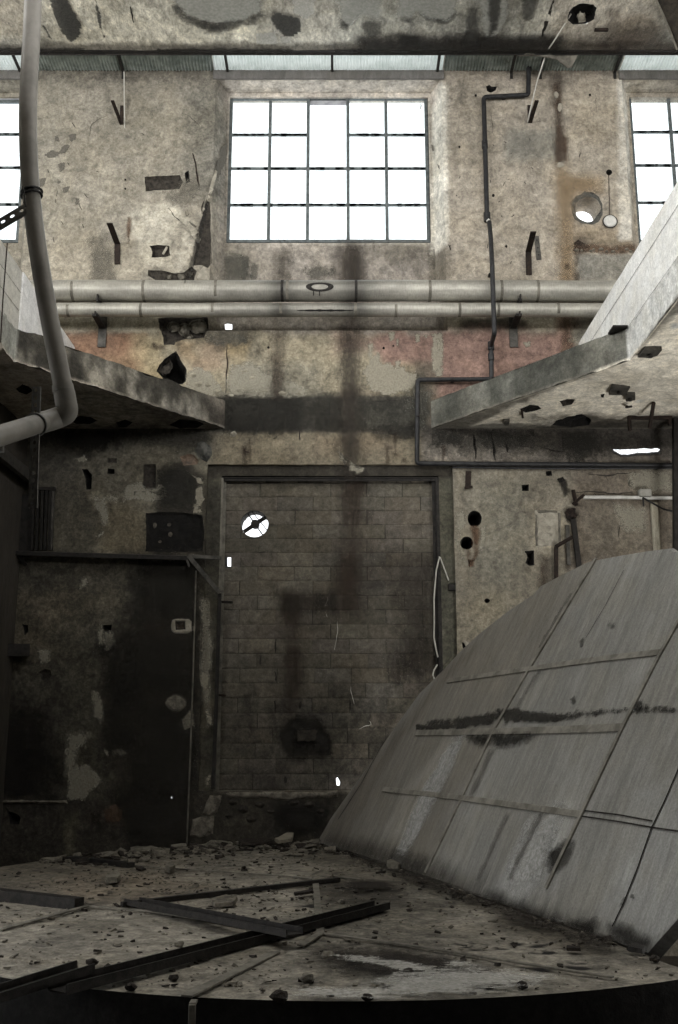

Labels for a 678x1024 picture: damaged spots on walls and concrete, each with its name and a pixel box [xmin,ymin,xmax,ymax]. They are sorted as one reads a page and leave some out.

peeling [148,141,228,283]
peeling [157,317,306,398]
spalling [553,399,591,427]